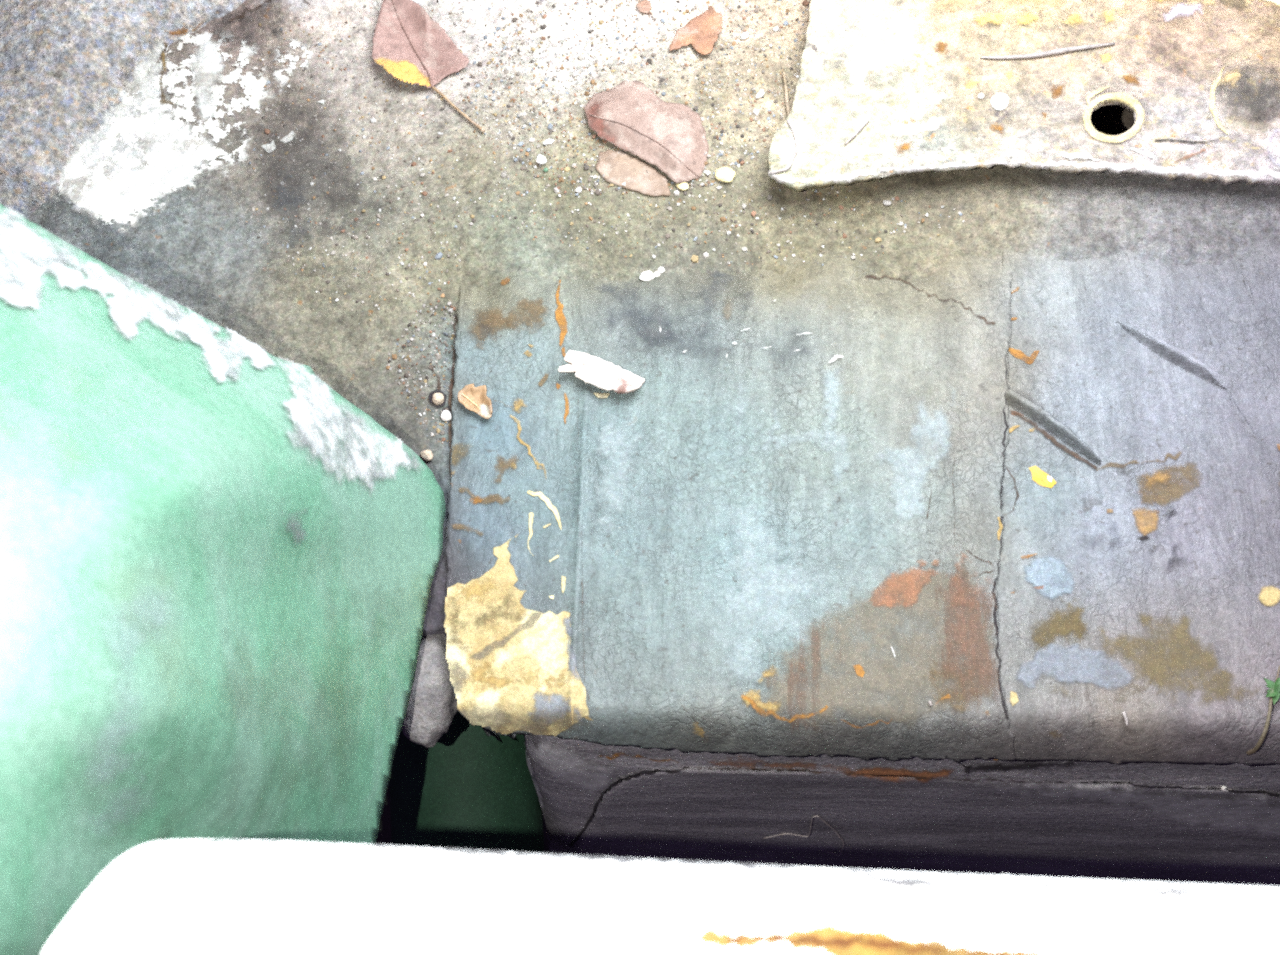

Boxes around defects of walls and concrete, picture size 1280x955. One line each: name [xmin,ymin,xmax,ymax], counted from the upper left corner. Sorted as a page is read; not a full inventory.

peeling [1153,0,1280,20]
corrosion [555,280,567,357]
corrosion [538,374,569,423]
corrosion [459,400,546,504]
crack [866,275,1019,719]
peeling [444,491,589,736]
corrosion [742,555,996,728]
crack [569,766,685,848]
crack [721,761,1280,797]